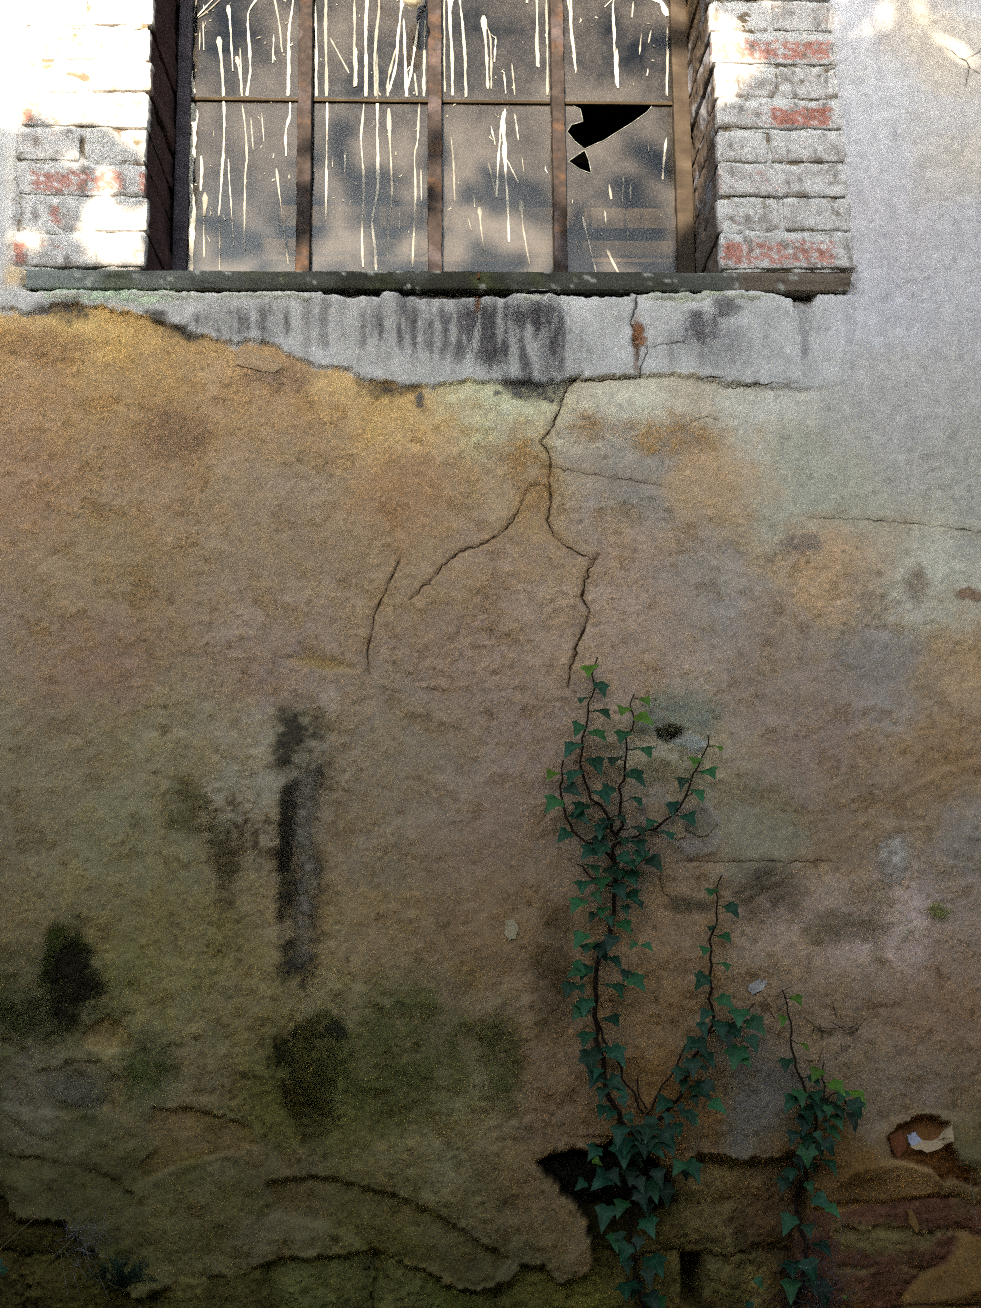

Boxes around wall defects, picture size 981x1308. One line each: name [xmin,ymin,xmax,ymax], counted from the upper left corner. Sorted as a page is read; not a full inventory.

damp [36,300,86,320]
damp [151,310,196,341]
damp [376,295,566,402]
damp [679,290,738,341]
damp [374,385,423,406]
crack [701,376,799,389]
crack [366,296,687,688]
damp [212,708,326,988]
flaking render [748,979,768,995]
flaking render [794,1115,981,1308]